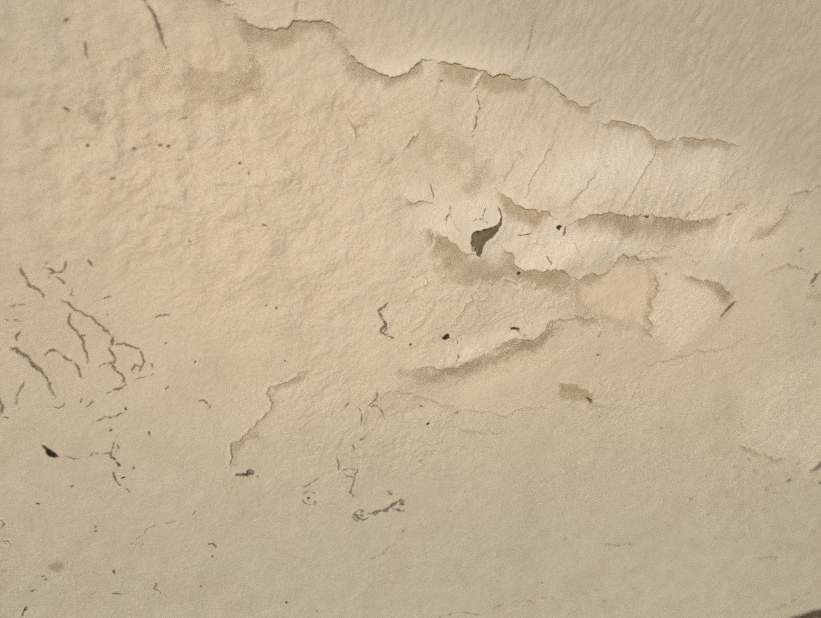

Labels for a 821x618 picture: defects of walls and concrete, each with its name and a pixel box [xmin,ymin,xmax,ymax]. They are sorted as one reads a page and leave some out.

crack [144,0,167,49]
peeling [239,3,348,40]
peeling [346,43,536,93]
peeling [597,113,742,147]
peeling [426,185,732,280]
crack [0,261,153,421]
crack [344,393,383,425]
crack [337,445,405,531]